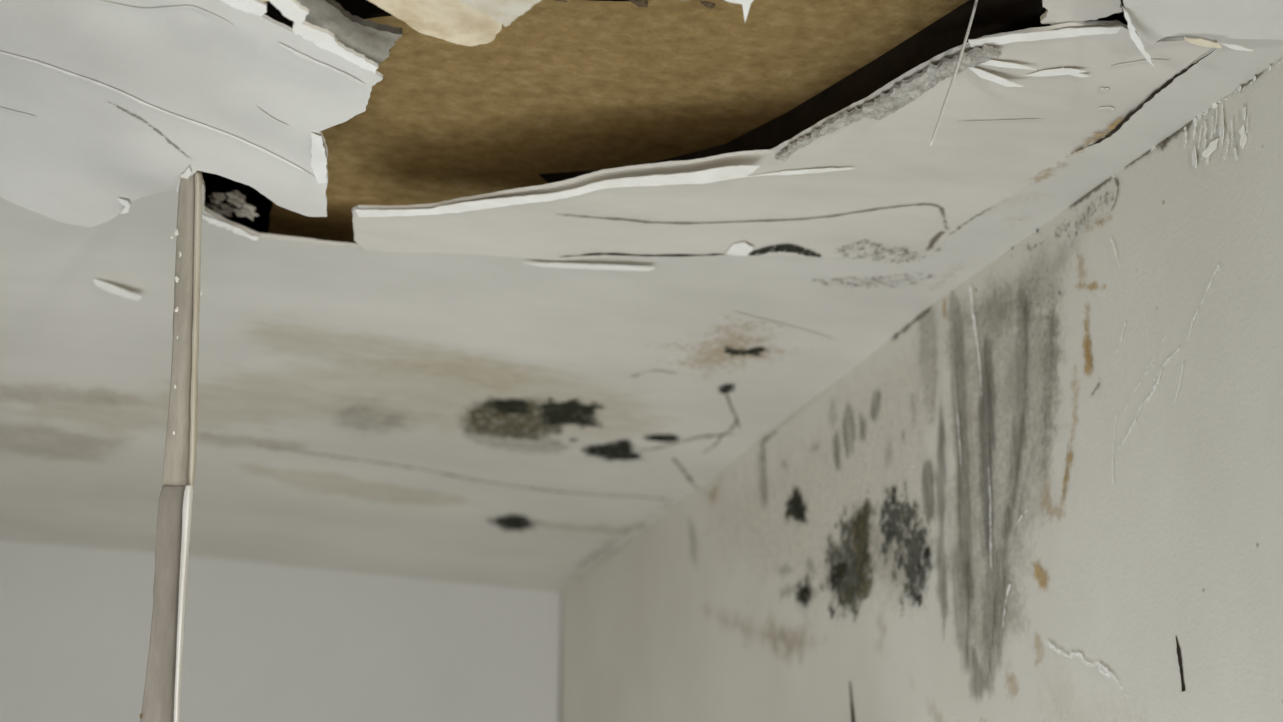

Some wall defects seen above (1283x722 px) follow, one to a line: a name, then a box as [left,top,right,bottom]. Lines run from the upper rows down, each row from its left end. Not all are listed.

peeling [725,0,753,22]
peeling [1122,0,1283,67]
crack [1070,49,1216,154]
peeling [1183,56,1283,168]
crack [1071,121,1192,207]
spalling [523,242,821,271]
crack [894,309,930,338]
damp [969,286,982,395]
mould [465,397,712,461]
crack [673,420,776,502]
mould [484,513,538,532]
mould [795,482,932,621]